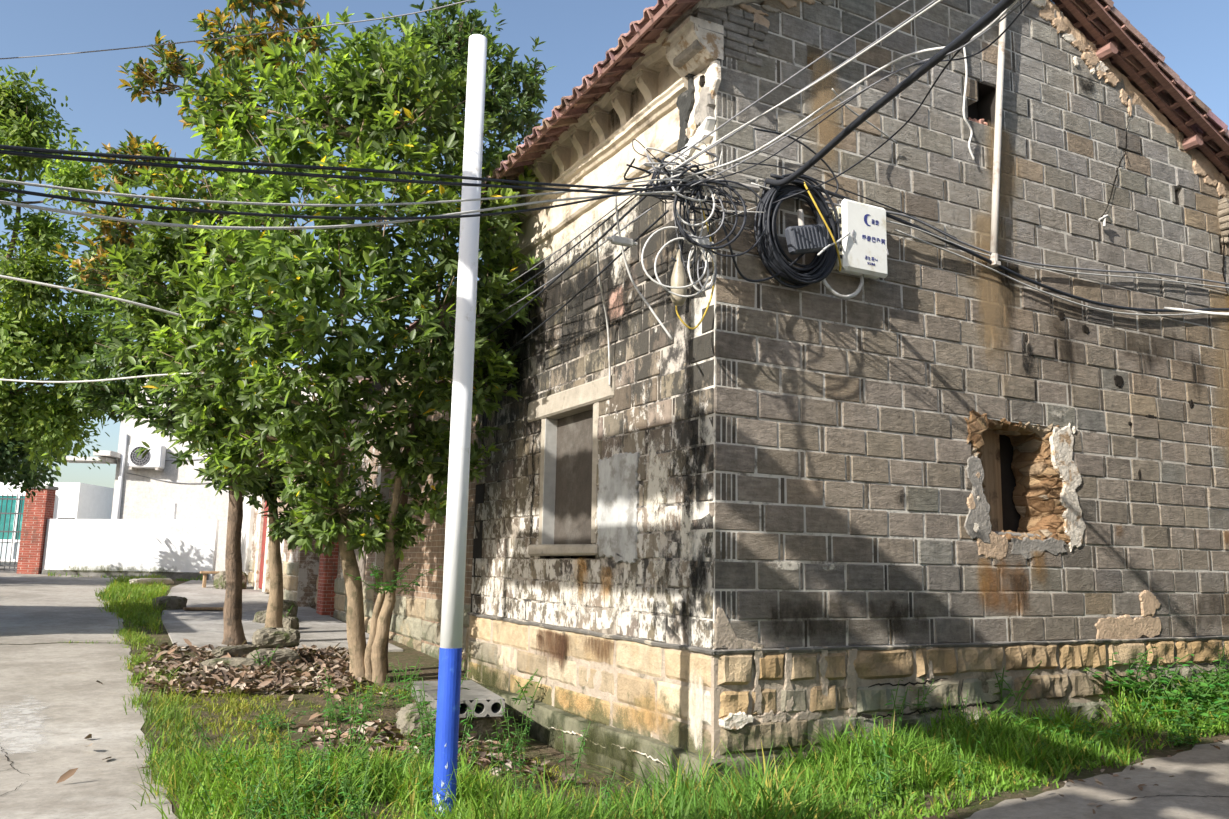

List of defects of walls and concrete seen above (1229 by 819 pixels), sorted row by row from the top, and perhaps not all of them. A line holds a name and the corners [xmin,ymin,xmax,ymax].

spalling [1031,0,1132,117]
peeling [676,60,721,176]
crack [1101,112,1130,217]
spalling [1192,158,1227,197]
damp [497,246,634,391]
damp [661,195,702,332]
crack [1221,237,1229,293]
peeling [596,446,693,615]
damp [682,383,707,513]
spalling [964,410,1085,561]
damp [652,546,707,634]
peeling [1095,590,1162,639]